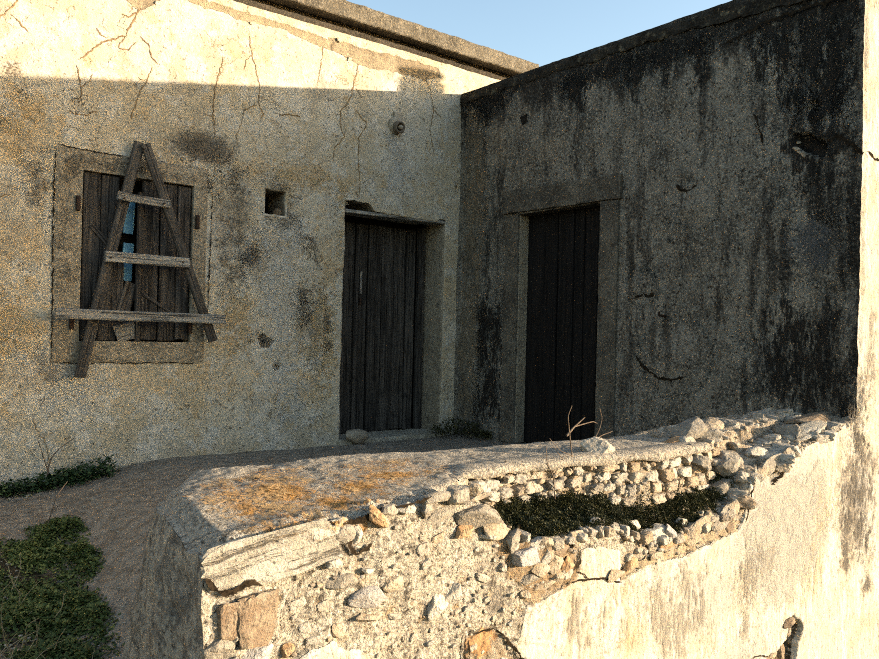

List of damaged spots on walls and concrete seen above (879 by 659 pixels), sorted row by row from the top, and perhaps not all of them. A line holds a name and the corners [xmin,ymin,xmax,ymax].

damp [0,88,127,283]
crack [67,8,158,119]
flaking render [127,0,160,10]
damp [157,126,267,354]
crack [205,36,300,145]
flaking render [189,0,440,81]
crack [333,64,367,199]
damp [722,0,862,203]
crack [827,133,879,161]
damp [735,299,879,639]
flaking render [621,520,739,580]
spalling [766,617,797,659]